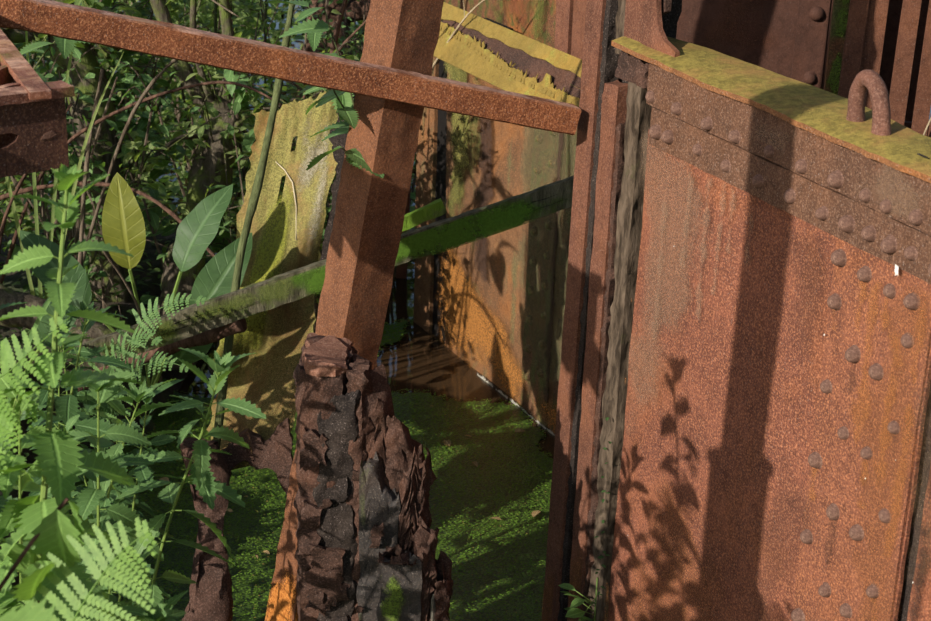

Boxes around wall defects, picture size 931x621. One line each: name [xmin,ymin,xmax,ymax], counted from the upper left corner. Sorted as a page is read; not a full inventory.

peeling [440,20,581,107]
water stain [300,138,327,239]
corrosion [440,250,525,396]